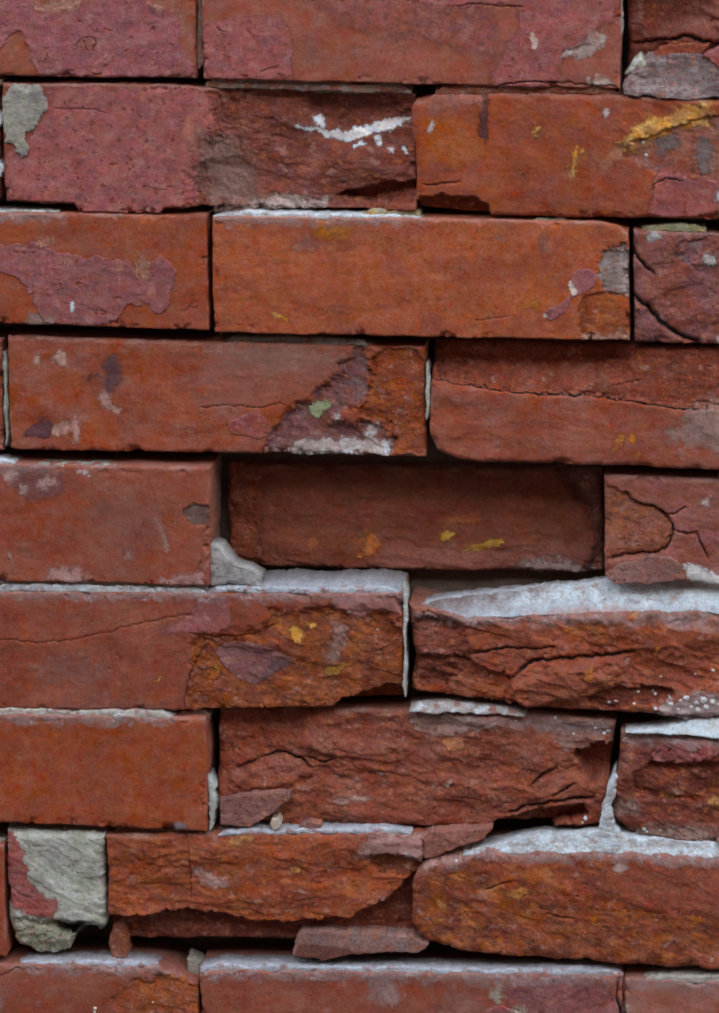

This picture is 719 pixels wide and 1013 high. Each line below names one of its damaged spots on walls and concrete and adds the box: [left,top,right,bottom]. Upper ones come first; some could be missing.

peeling [0,0,417,213]
spalling [419,194,490,212]
peeling [0,241,177,326]
spalling [674,234,719,279]
spalling [263,243,719,454]
crack [611,492,708,559]
spalling [160,597,471,708]
peeling [7,831,79,952]
spalling [113,853,719,964]
spalling [111,973,198,1013]
peeling [485,973,622,1013]